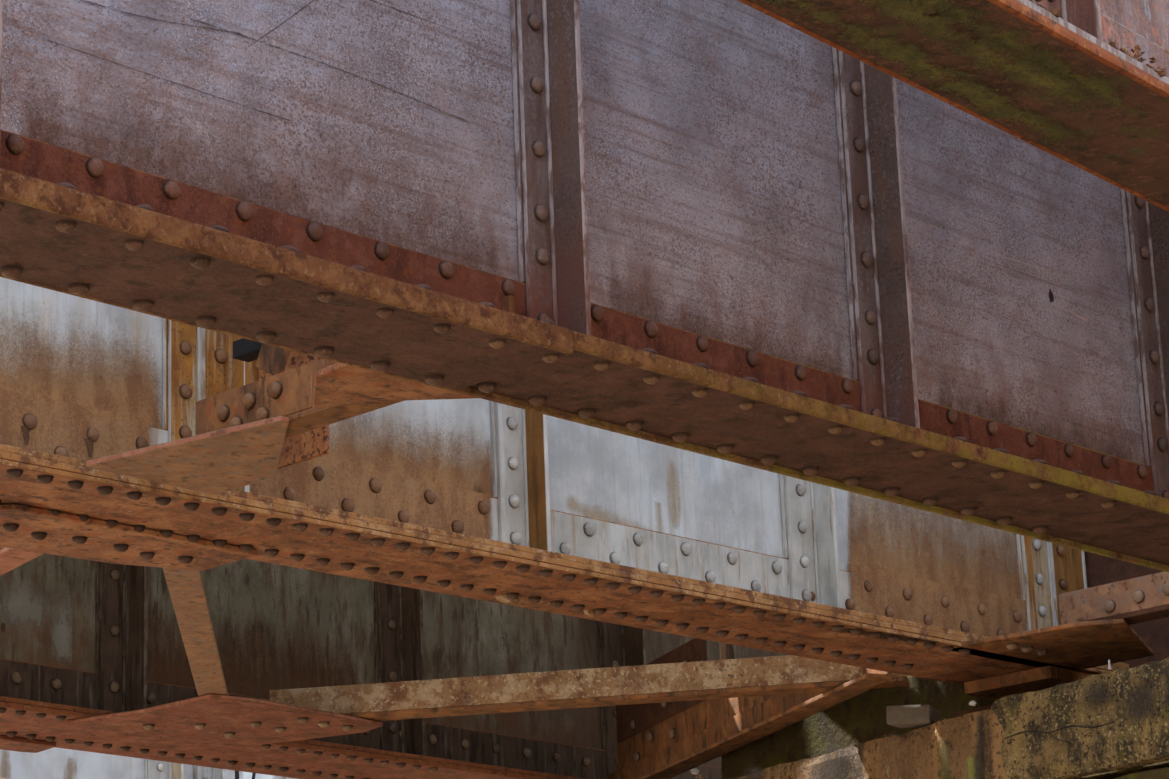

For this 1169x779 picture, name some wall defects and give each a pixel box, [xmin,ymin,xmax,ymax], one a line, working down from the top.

corrosion [0,340,161,461]
corrosion [250,427,493,539]
corrosion [849,503,1028,637]